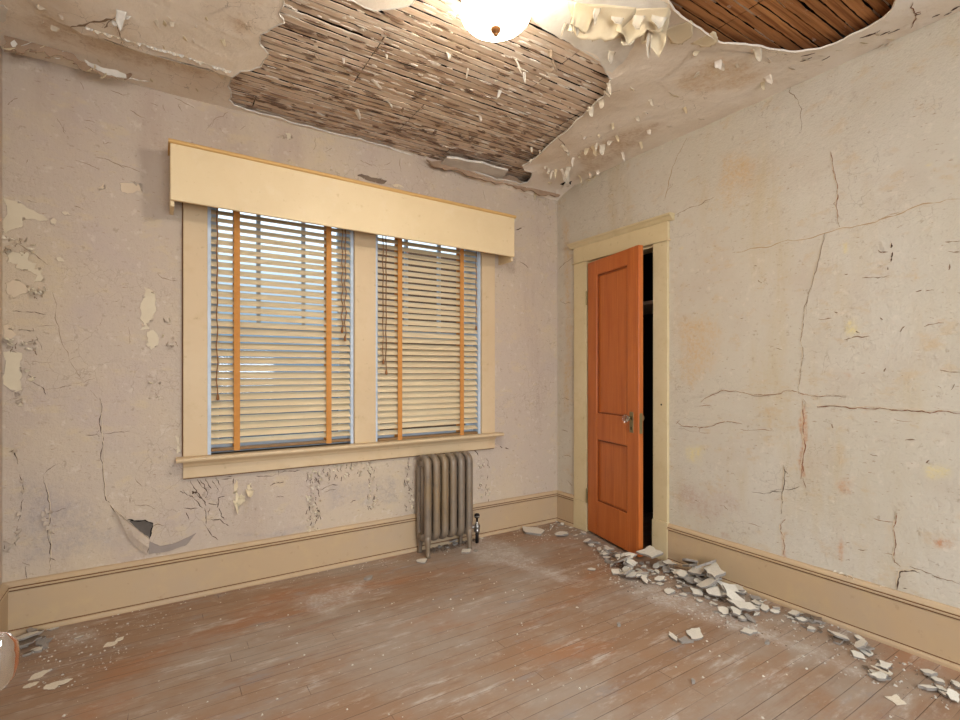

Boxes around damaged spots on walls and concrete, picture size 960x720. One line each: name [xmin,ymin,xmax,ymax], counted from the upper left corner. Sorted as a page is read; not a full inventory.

peeling [2,35,153,82]
spalling [227,0,897,200]
peeling [2,198,57,235]
peeling [5,249,45,299]
peeling [2,323,24,407]
peeling [139,287,159,350]
crack [676,153,959,556]
crack [18,295,127,519]
crack [2,449,65,577]
crack [180,476,234,540]
crack [876,513,959,589]